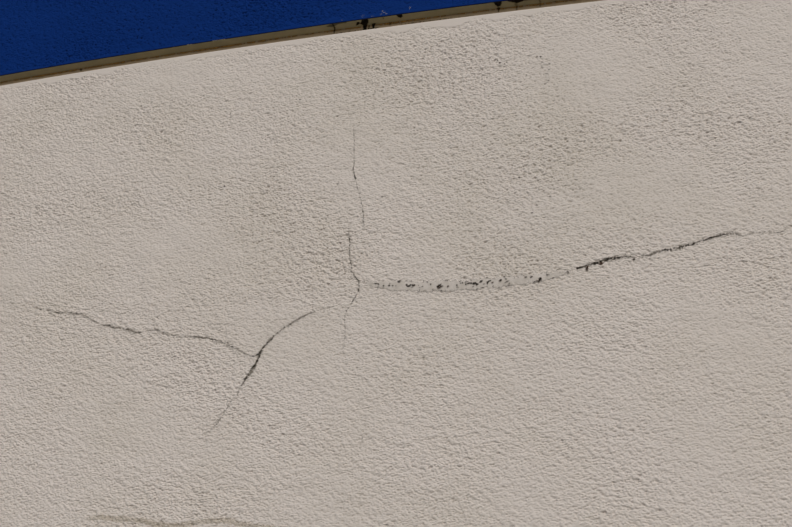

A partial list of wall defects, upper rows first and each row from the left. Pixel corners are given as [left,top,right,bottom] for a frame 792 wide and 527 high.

crack [576,233,738,269]
crack [56,312,310,395]